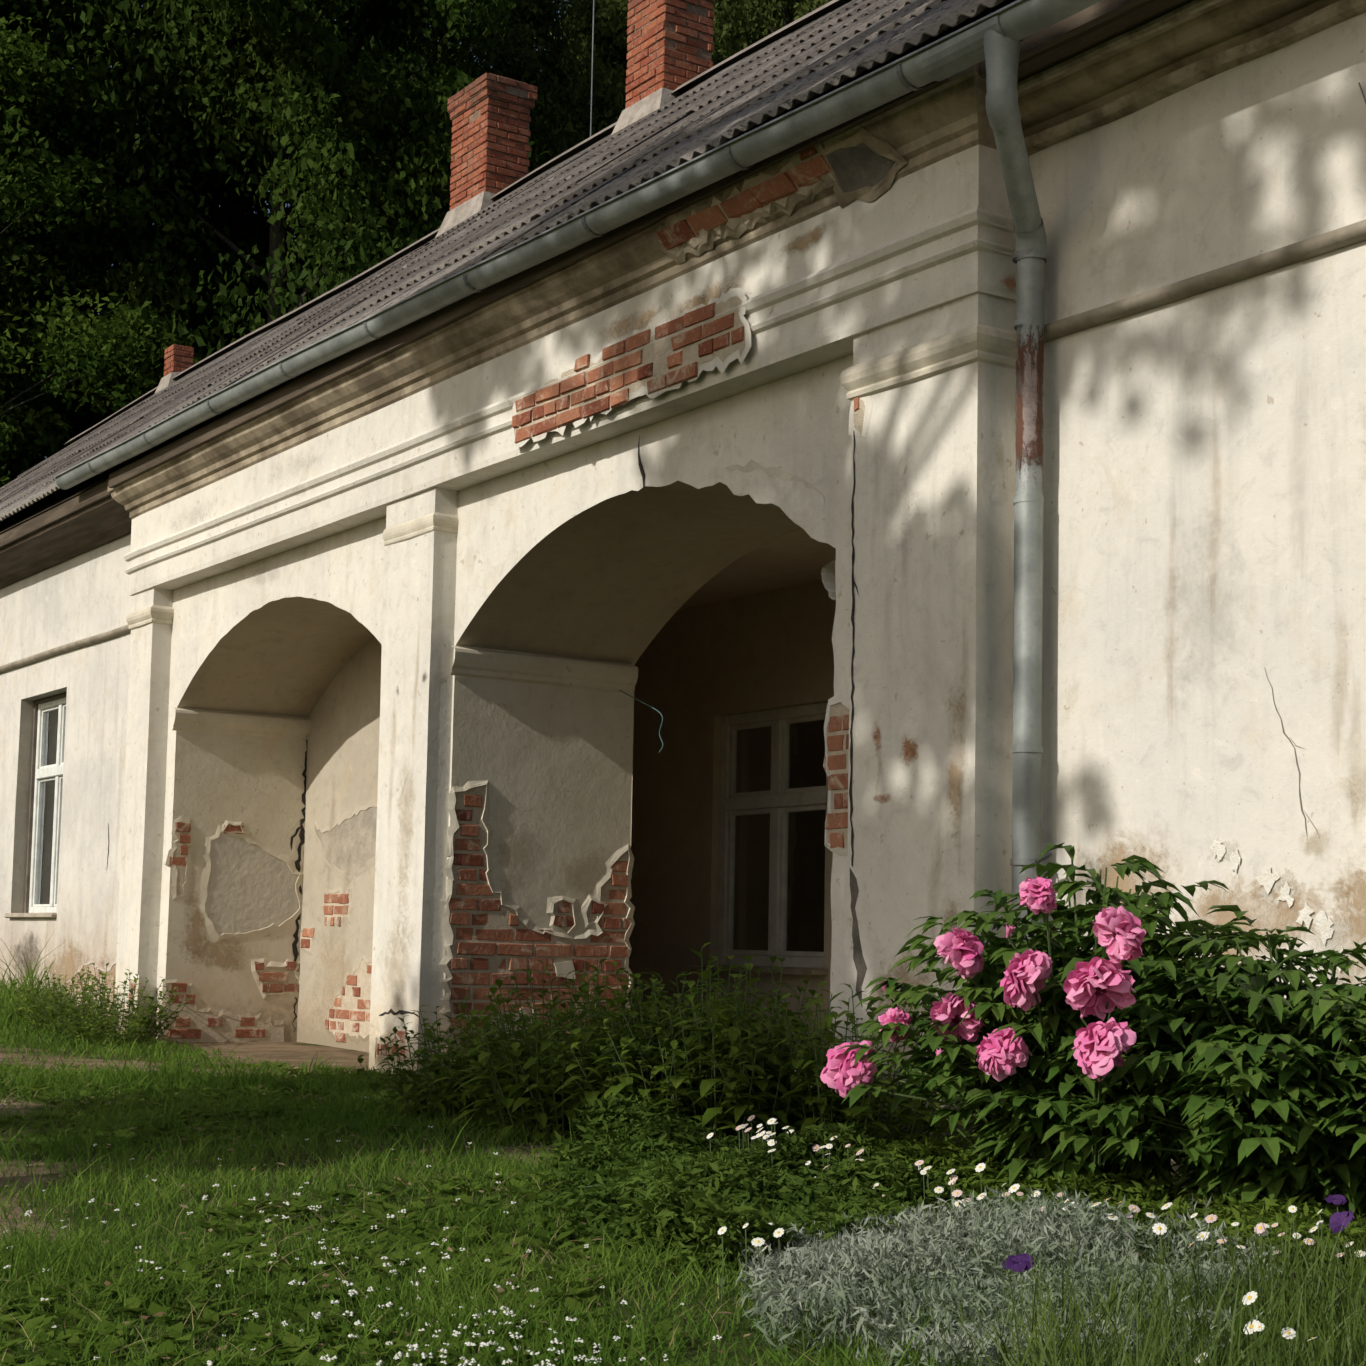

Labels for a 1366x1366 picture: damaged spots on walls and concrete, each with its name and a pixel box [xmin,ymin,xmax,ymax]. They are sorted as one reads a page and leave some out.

spalling [655,127,908,264]
spalling [512,288,751,448]
corrosion [1015,328,1044,488]
crack [1264,667,1320,849]
peeling [159,798,377,1043]
crack [290,740,308,1031]
spalling [438,780,635,1067]
spalling [823,691,877,1019]
damp [1093,845,1169,906]
damp [1198,885,1316,956]
peeling [1255,866,1350,972]
damp [1335,871,1366,941]